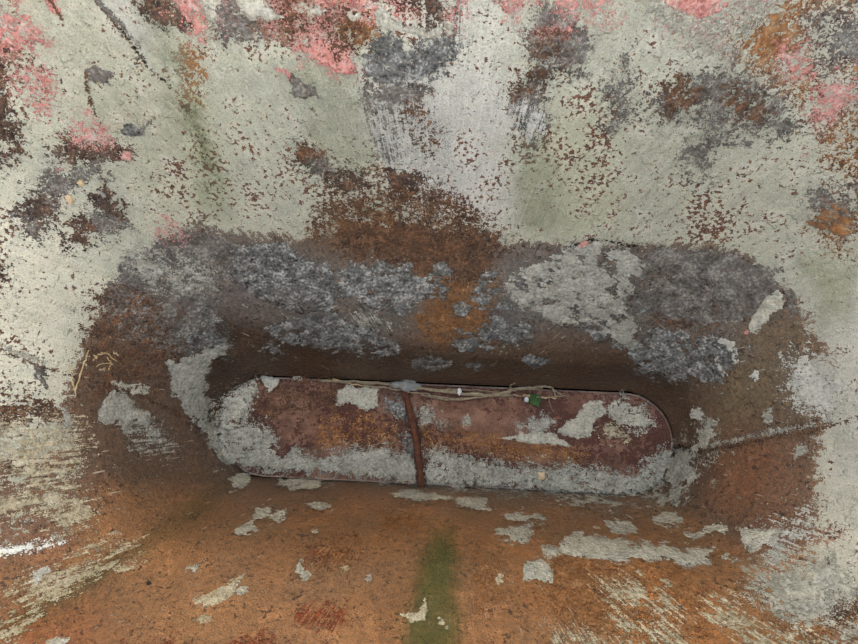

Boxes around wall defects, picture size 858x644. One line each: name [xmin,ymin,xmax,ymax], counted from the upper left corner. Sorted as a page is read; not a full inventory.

peeling [0,0,75,125]
peeling [120,116,156,138]
rust [589,0,858,268]
peeling [1,145,116,247]
rust [283,86,513,354]
peeling [714,337,739,378]
rust [246,370,408,452]
rust [419,422,598,469]
crack [674,415,858,454]
peeling [234,504,288,536]
damp [409,536,454,644]
rust [461,526,723,644]